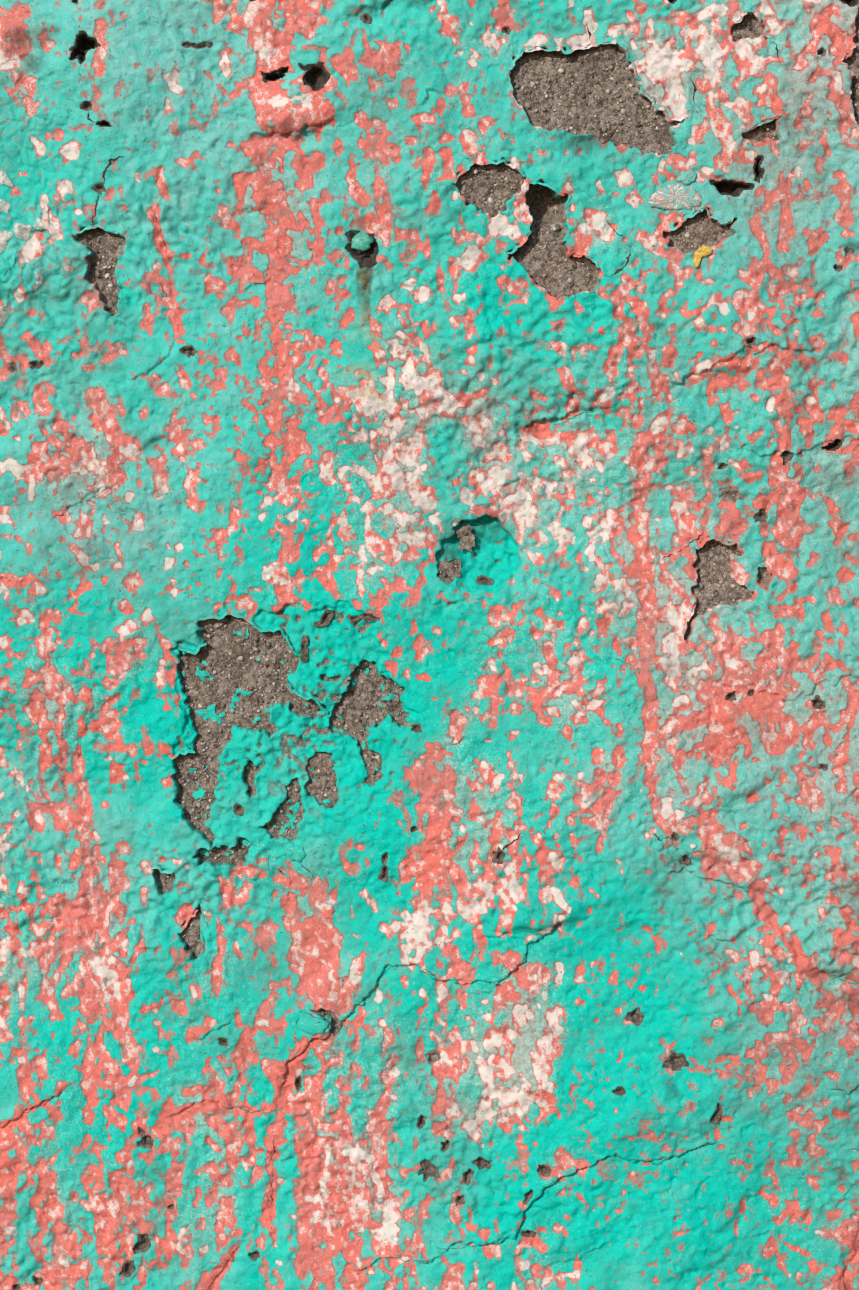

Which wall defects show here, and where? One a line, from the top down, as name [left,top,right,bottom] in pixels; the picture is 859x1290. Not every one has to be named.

spalling [506,29,708,155]
peeling [648,0,859,254]
spalling [75,224,126,316]
spalling [453,159,600,299]
peeling [631,394,842,814]
spalling [170,610,478,882]
peeling [264,752,344,985]
crack [0,1084,69,1124]
crack [229,919,565,1217]
peeling [13,1247,89,1290]
crack [206,1245,239,1290]
crack [350,1141,718,1273]